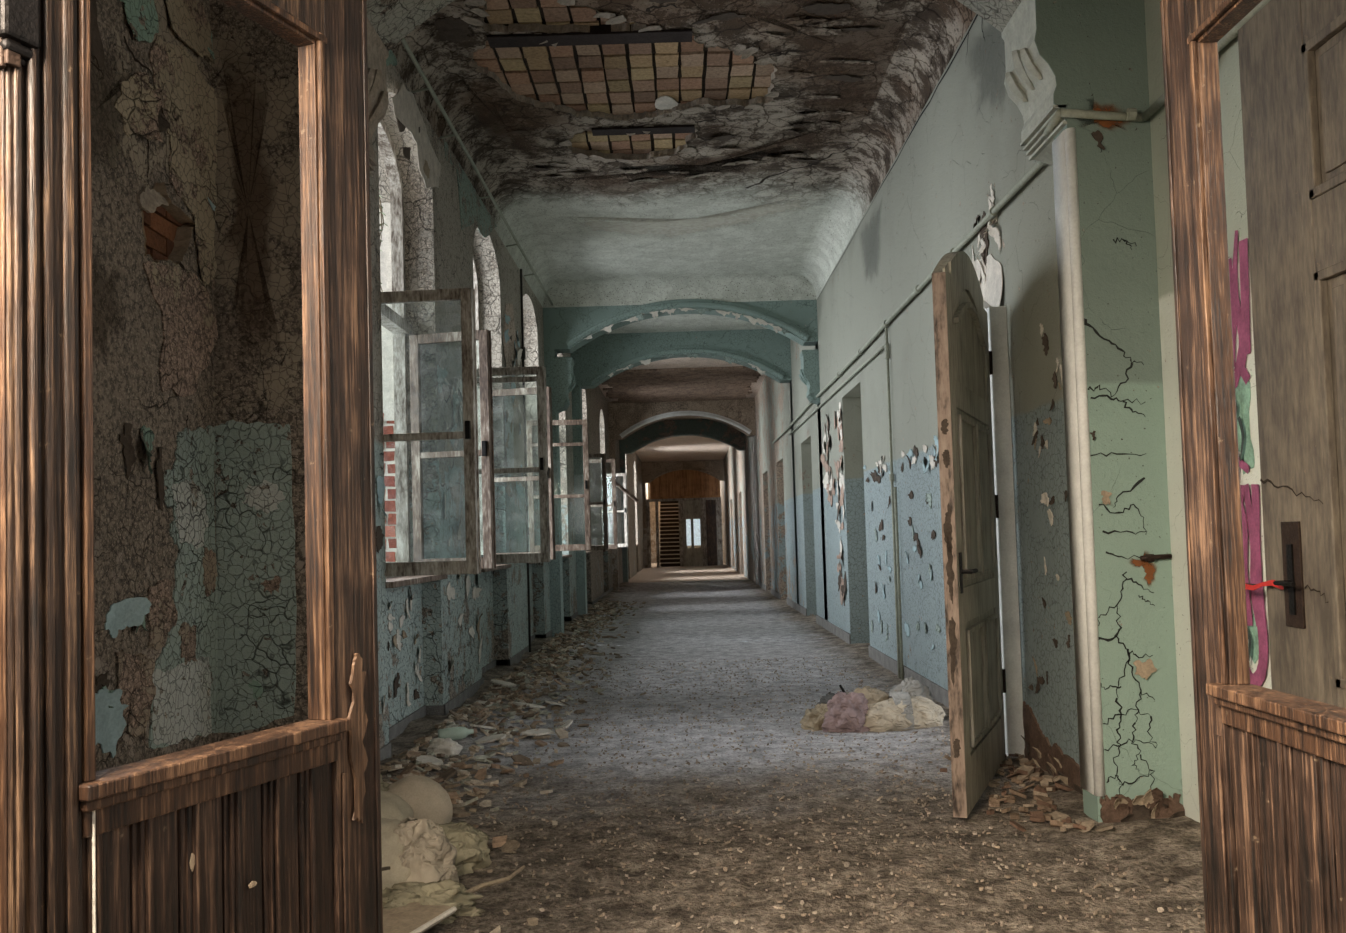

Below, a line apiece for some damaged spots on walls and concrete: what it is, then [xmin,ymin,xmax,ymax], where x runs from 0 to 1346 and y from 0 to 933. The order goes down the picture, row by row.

peeling [90,0,105,68]
spalling [435,0,883,184]
flaking render [120,0,218,397]
peeling [95,420,297,758]
peeling [376,475,387,553]
peeling [379,587,423,714]
peeling [446,574,483,664]
peeling [820,402,846,606]
spalling [863,272,967,818]
crack [1090,452,1157,794]